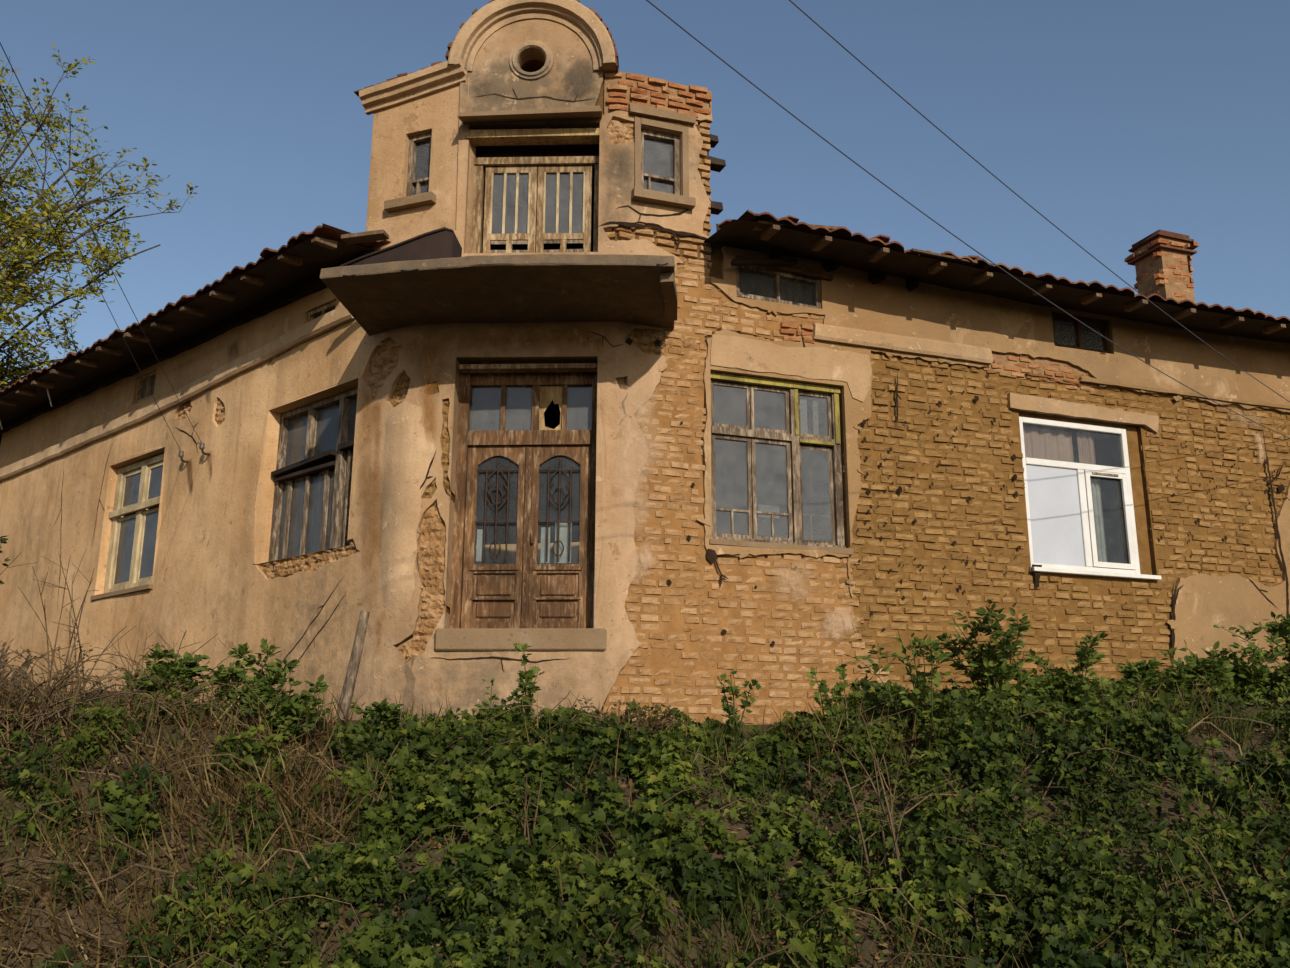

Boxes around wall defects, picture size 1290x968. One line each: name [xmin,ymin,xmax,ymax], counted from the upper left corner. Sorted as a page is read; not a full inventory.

spalling [360,338,411,408]
spalling [600,72,1290,725]
spalling [255,540,360,580]
spalling [397,383,451,662]
crack [1248,428,1289,619]